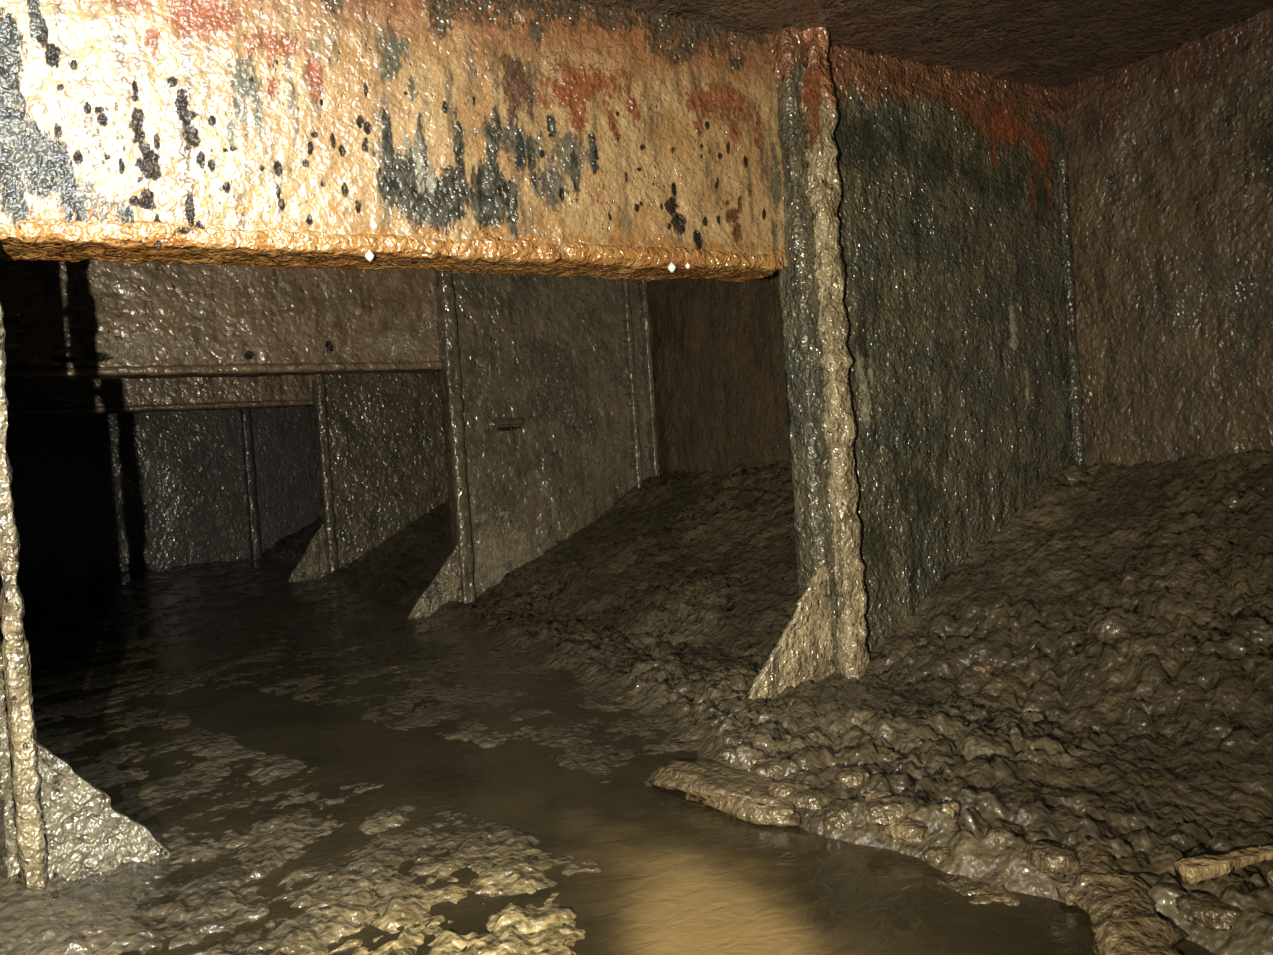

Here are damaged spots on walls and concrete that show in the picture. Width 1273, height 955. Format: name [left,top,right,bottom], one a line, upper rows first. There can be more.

rust [104,0,324,103]
damp [426,0,456,38]
damp [0,0,134,228]
damp [226,57,262,144]
damp [372,28,599,238]
rust [500,54,640,138]
rust [680,81,763,151]
rust [800,66,825,155]
damp [833,109,1047,224]
rust [232,201,350,232]
rust [695,185,784,252]
damp [853,351,873,428]